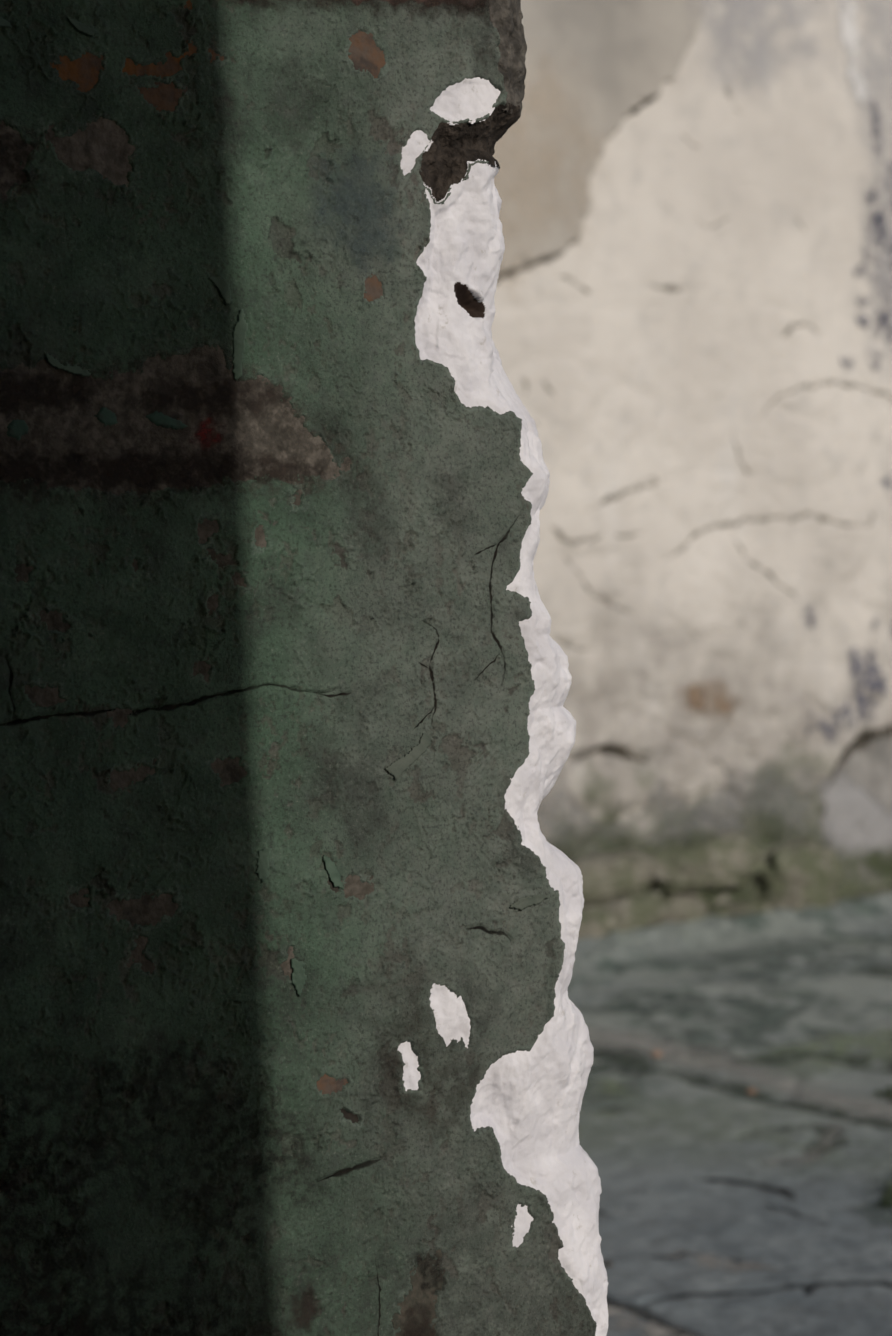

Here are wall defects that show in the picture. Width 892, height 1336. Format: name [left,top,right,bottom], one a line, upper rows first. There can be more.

peeling [348,30,386,78]
crack [475,517,518,678]
crack [554,478,665,611]
crack [672,512,874,597]
crack [0,663,349,726]
crack [415,625,439,728]
flaking render [397,0,608,1336]
peeling [391,1249,445,1336]